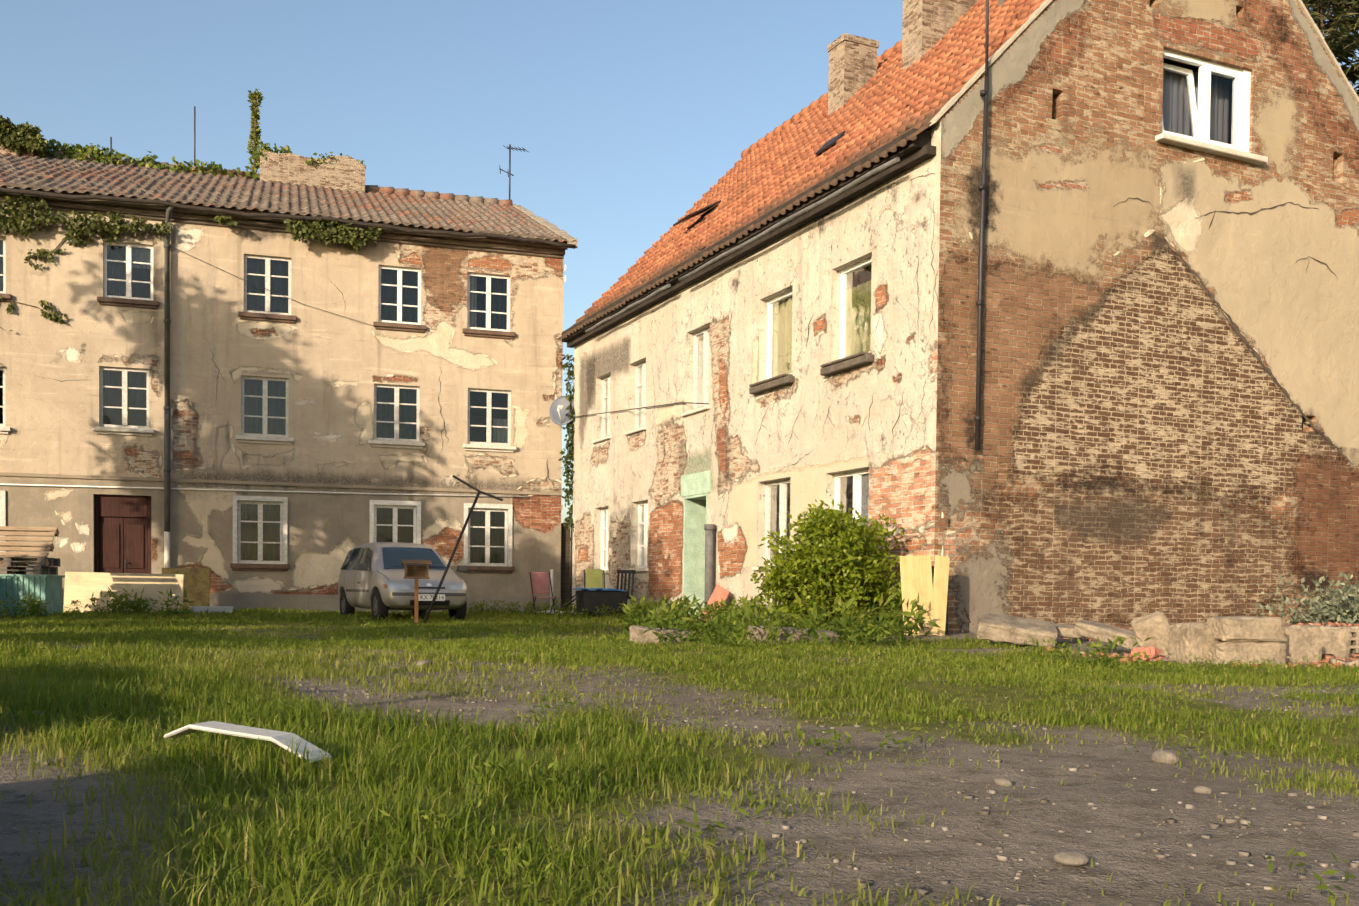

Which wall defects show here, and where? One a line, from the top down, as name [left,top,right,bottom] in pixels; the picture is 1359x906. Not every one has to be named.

flaking render [59,344,85,363]
flaking render [98,353,356,595]
flaking render [326,374,419,387]
flaking render [353,400,431,470]
flaking render [372,243,568,371]
flaking render [440,333,688,602]
flaking render [823,280,902,391]
flaking render [868,0,1359,628]
crack [1113,197,1353,465]
flaking render [422,518,464,568]
flaking render [717,522,748,579]